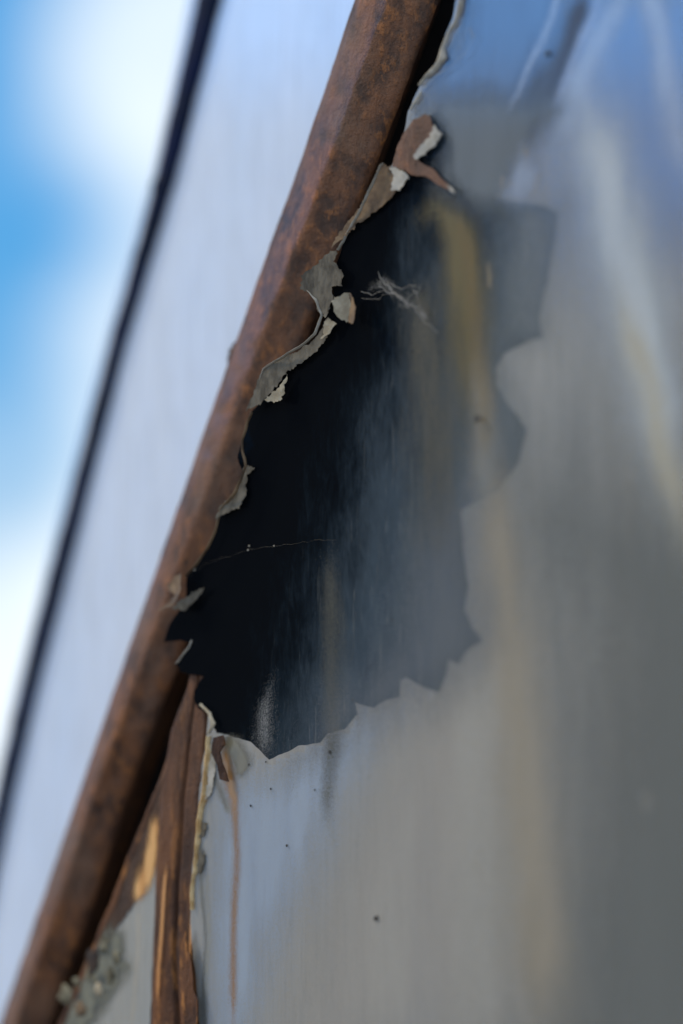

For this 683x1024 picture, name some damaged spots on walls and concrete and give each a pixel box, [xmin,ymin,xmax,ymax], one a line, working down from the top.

corrosion [392,114,455,194]
peeling [158,108,558,910]
corrosion [59,674,243,1024]